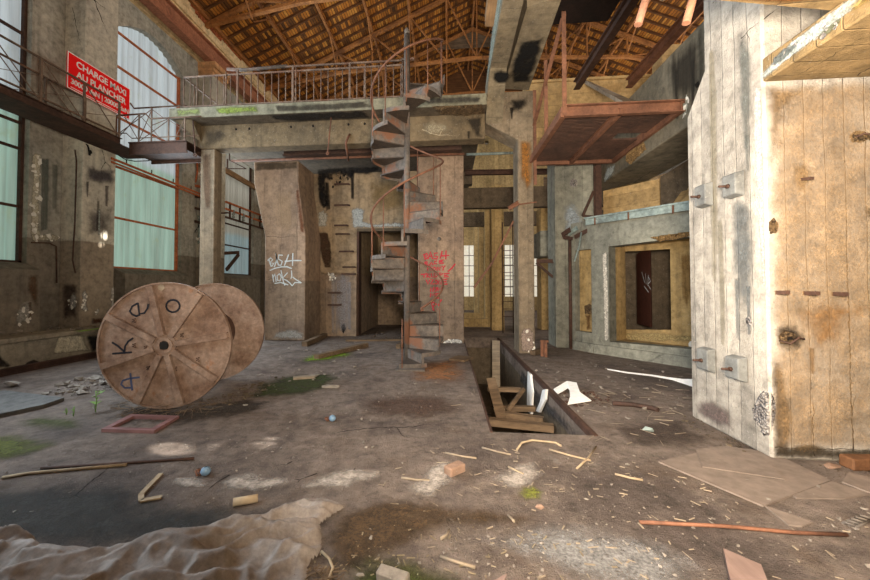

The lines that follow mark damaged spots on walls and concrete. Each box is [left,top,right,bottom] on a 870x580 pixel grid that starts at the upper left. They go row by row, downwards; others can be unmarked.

water stain [741,49,749,148]
flaking render [772,42,798,67]
flaking render [812,18,840,40]
flaking render [29,154,60,242]
water stain [318,167,404,267]
water stain [735,207,750,333]
spalling [752,391,776,436]